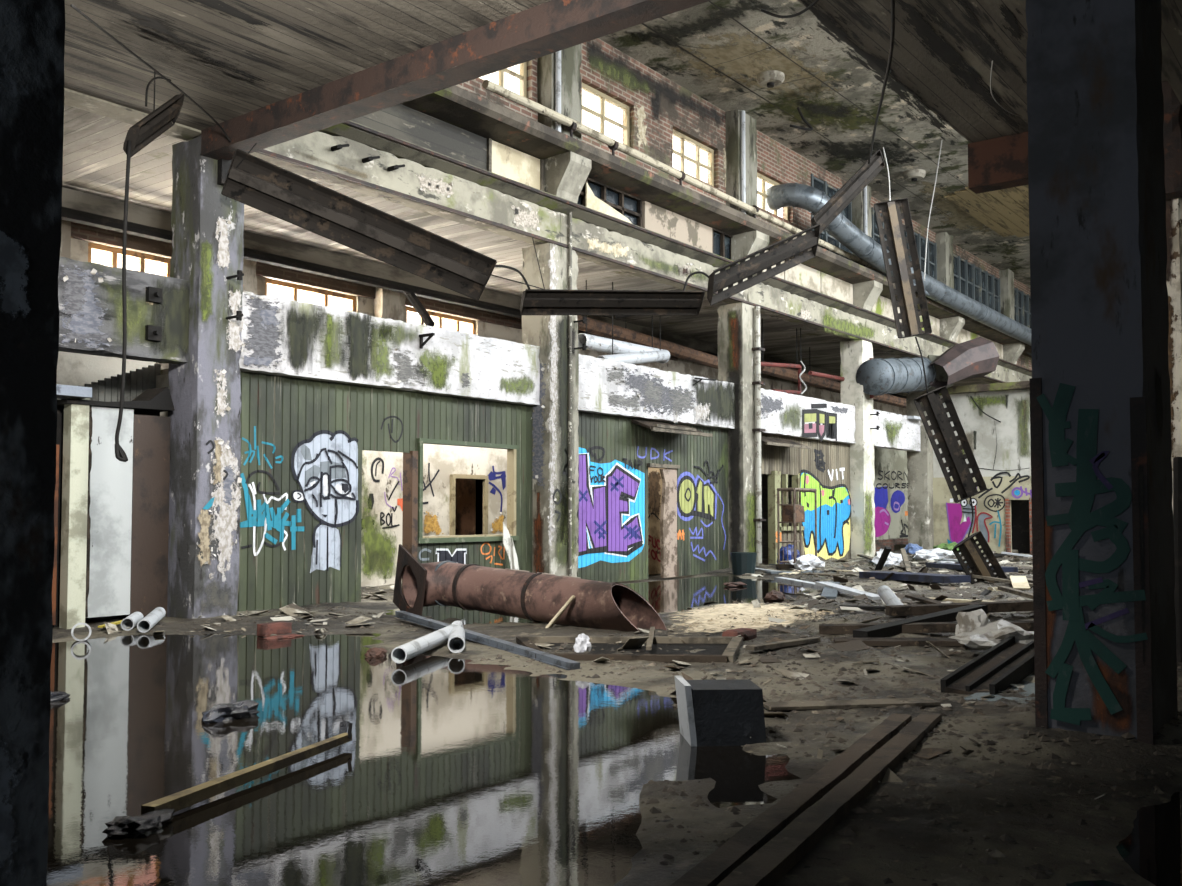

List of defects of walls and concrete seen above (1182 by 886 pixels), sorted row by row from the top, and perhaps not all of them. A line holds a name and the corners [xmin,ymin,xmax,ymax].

damp [625,0,843,100]
damp [800,139,932,166]
damp [915,181,991,235]
peeling [215,218,232,268]
damp [281,306,418,378]
peeling [213,368,231,417]
damp [431,362,445,388]
peeling [606,365,696,419]
peeling [197,437,243,579]